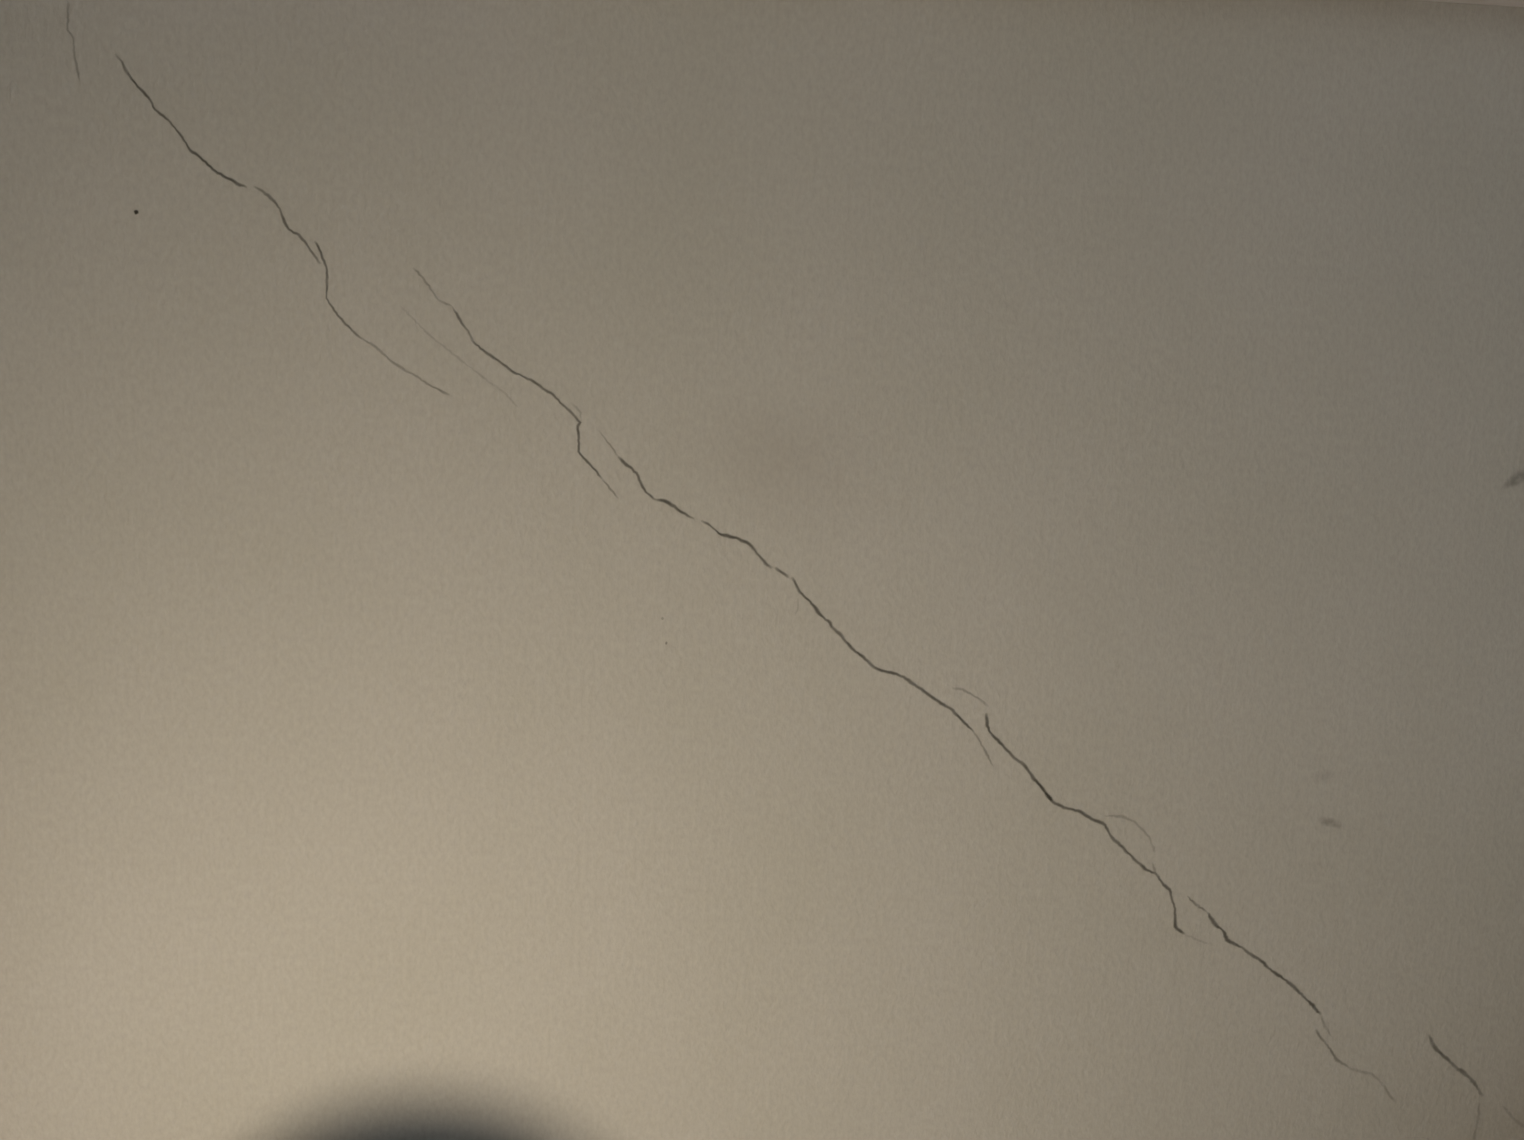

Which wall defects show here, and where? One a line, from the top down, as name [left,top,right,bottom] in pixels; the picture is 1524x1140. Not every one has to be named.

crack [187,146,233,181]
crack [931,696,1003,745]